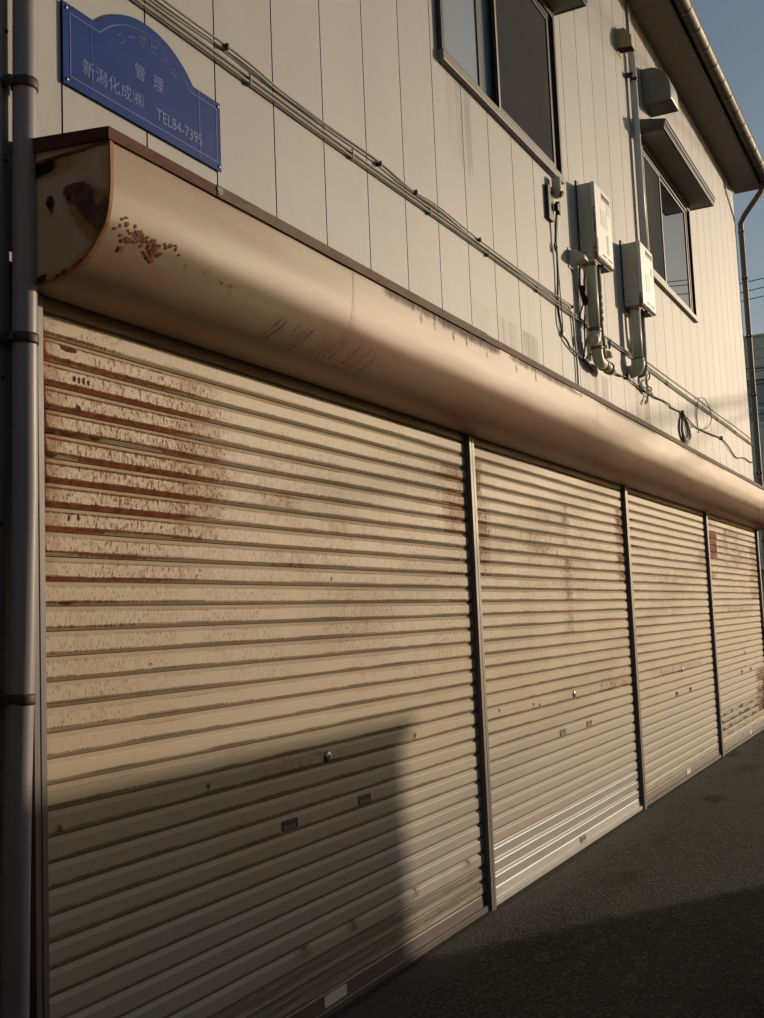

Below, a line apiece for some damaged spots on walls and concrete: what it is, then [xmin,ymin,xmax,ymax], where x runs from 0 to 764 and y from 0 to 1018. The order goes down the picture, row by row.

corrosion [35,140,107,181]
corrosion [36,181,233,293]
corrosion [43,317,240,582]
corrosion [434,465,493,602]
corrosion [613,509,637,582]